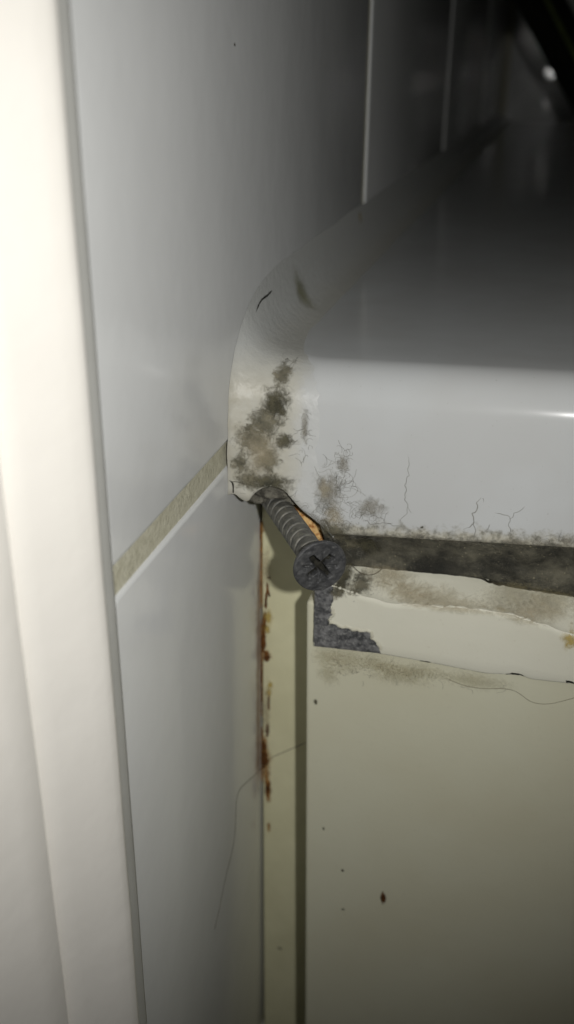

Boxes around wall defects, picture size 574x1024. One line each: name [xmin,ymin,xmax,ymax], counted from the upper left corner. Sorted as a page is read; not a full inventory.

leakage [232,357,298,488]
corrosion [257,521,272,800]
peeling [313,584,382,654]